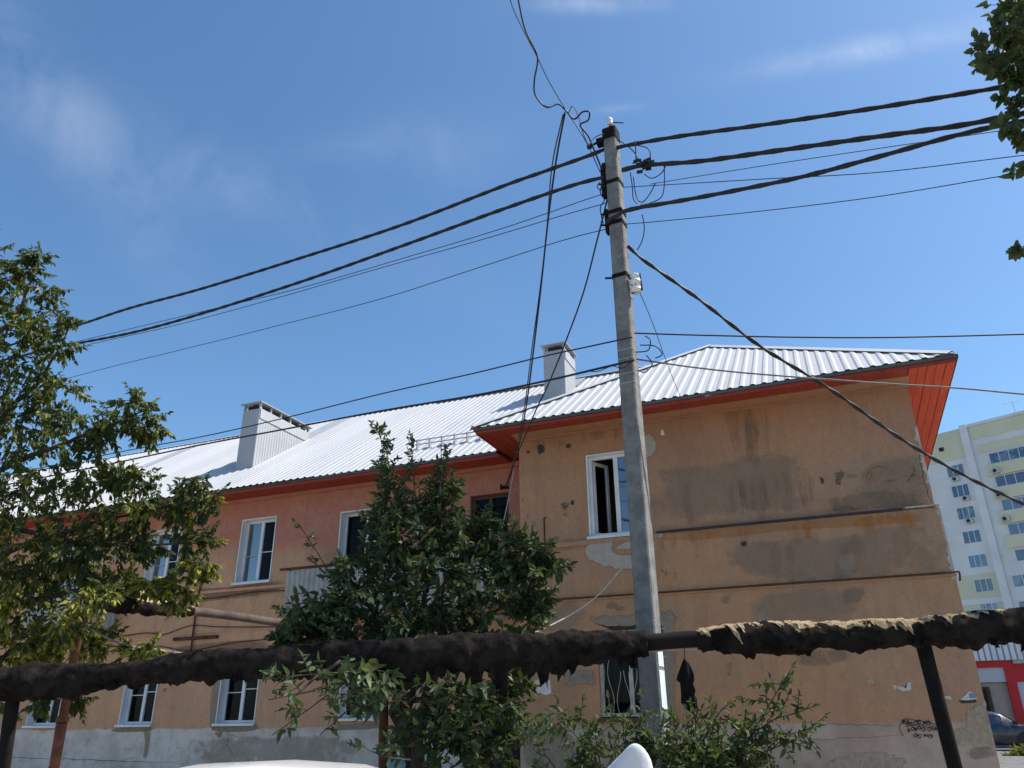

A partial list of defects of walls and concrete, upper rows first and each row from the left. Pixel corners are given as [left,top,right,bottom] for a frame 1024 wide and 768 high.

flaking render [584,541,632,569]
flaking render [955,701,993,749]